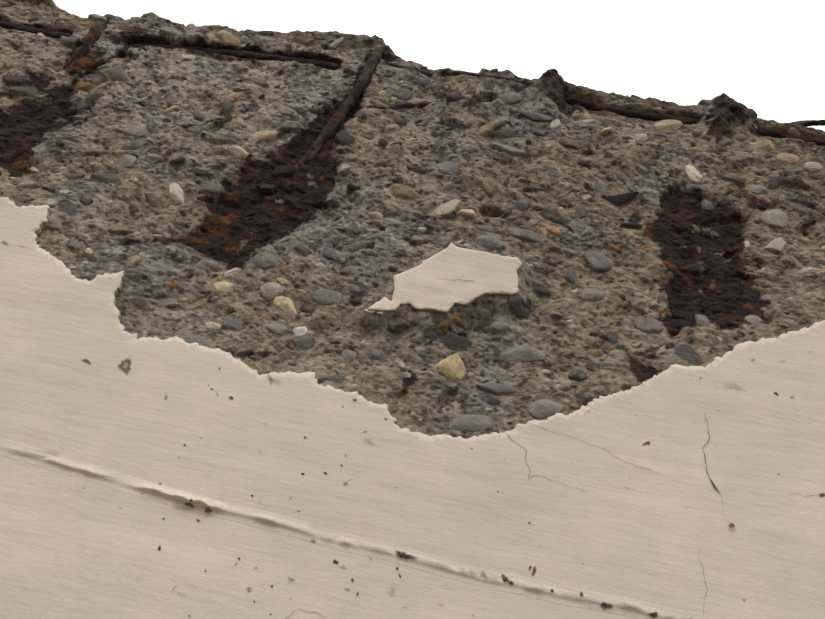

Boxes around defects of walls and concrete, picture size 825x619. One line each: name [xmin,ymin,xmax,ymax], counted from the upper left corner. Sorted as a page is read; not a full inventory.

corrosion [107,28,343,69]
corrosion [0,23,105,177]
corrosion [542,69,576,116]
corrosion [696,93,756,142]
corrosion [162,51,385,269]
spalling [0,0,825,439]
corrosion [746,196,783,210]
corrosion [644,184,771,337]
crack [702,418,719,492]